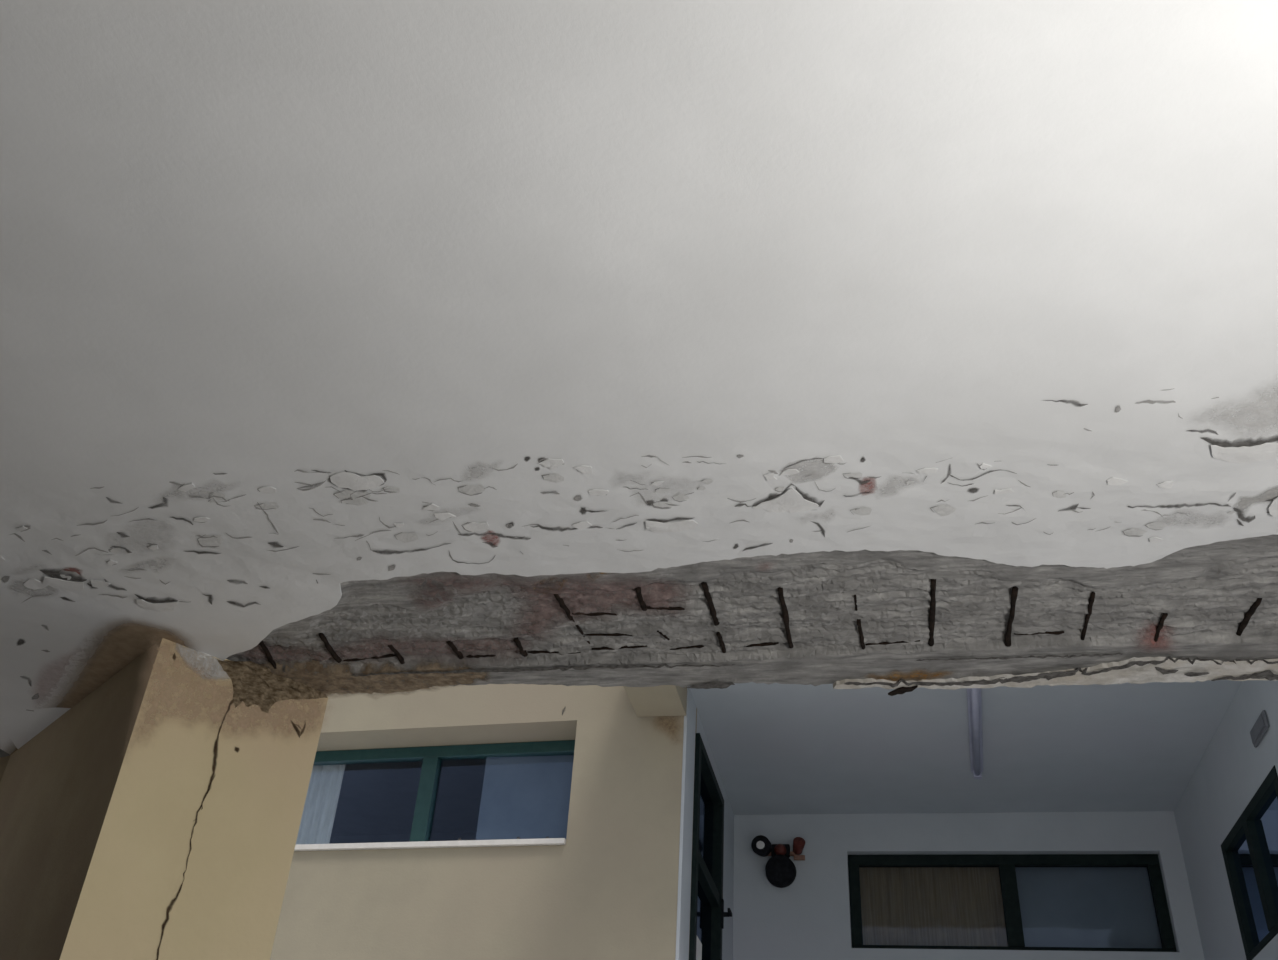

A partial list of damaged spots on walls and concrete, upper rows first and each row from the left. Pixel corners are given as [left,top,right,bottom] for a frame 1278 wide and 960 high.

peeling [1188,388,1278,463]
peeling [42,487,251,579]
peeling [170,482,299,552]
corrosion [482,531,499,547]
corrosion [244,572,681,661]
spalling [217,455,1278,713]
leakage [53,622,320,731]
corrosion [874,672,944,681]
crack [156,699,242,960]